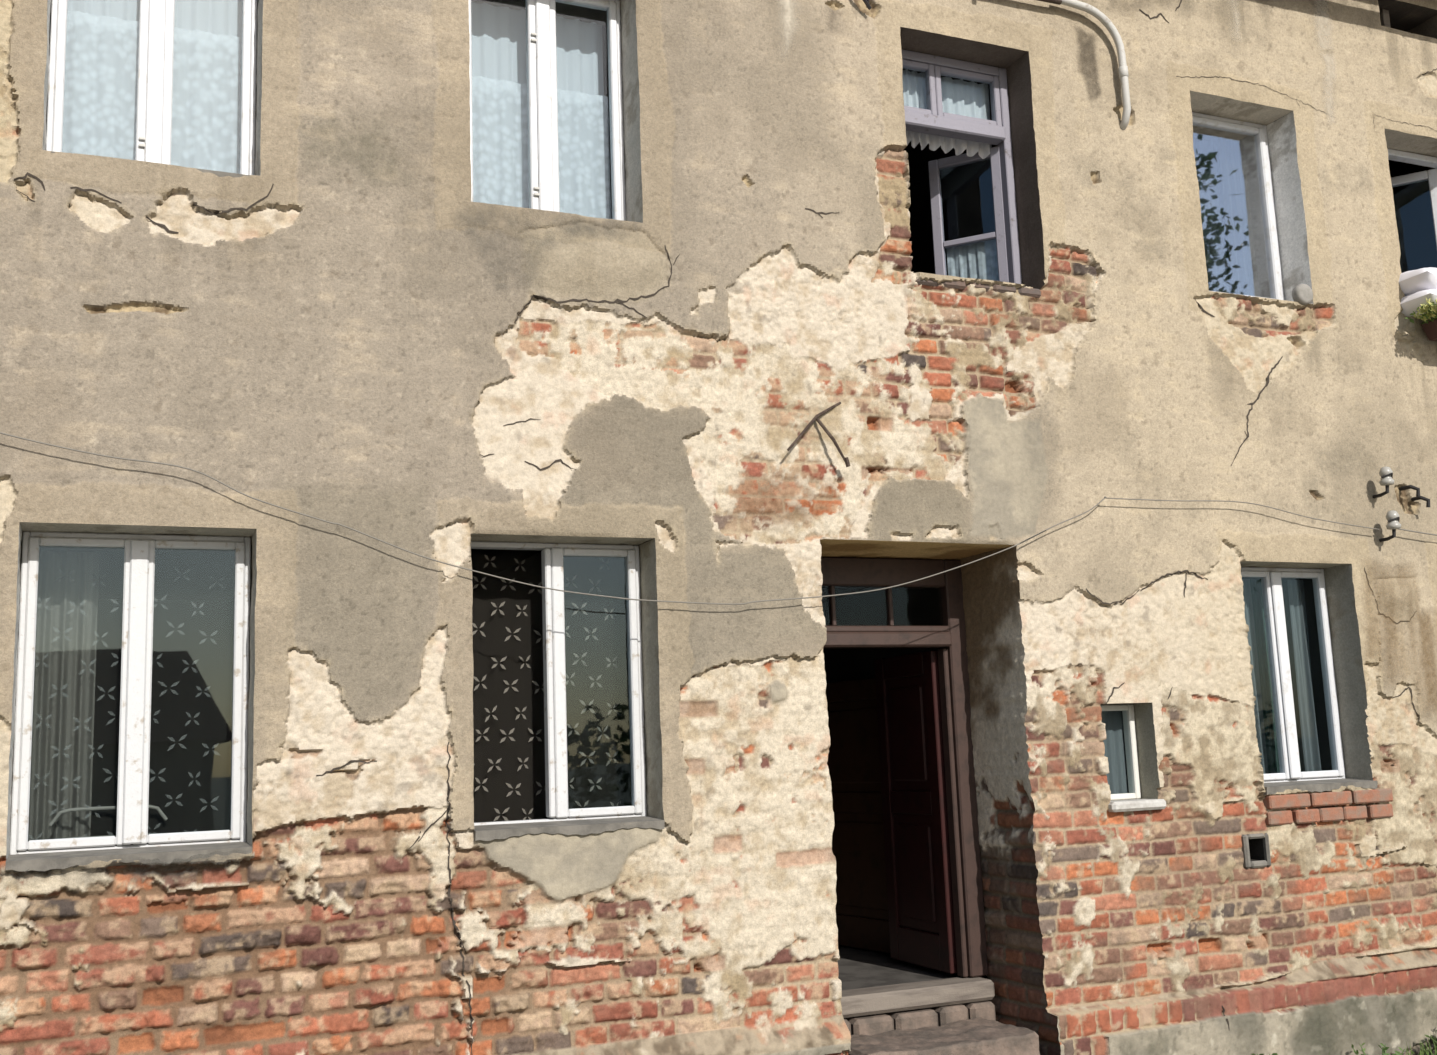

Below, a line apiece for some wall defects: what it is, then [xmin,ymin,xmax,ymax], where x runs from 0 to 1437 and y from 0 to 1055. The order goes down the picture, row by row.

peeling [69,188,303,247]
peeling [472,144,1106,627]
crack [1231,356,1283,466]
peeling [1193,292,1337,394]
peeling [431,517,475,582]
crack [1086,570,1208,605]
crack [1364,567,1415,624]
crack [1392,683,1420,722]
crack [316,760,377,776]
peeling [0,626,842,1055]
peeling [1018,539,1437,1055]
crack [409,742,474,1055]